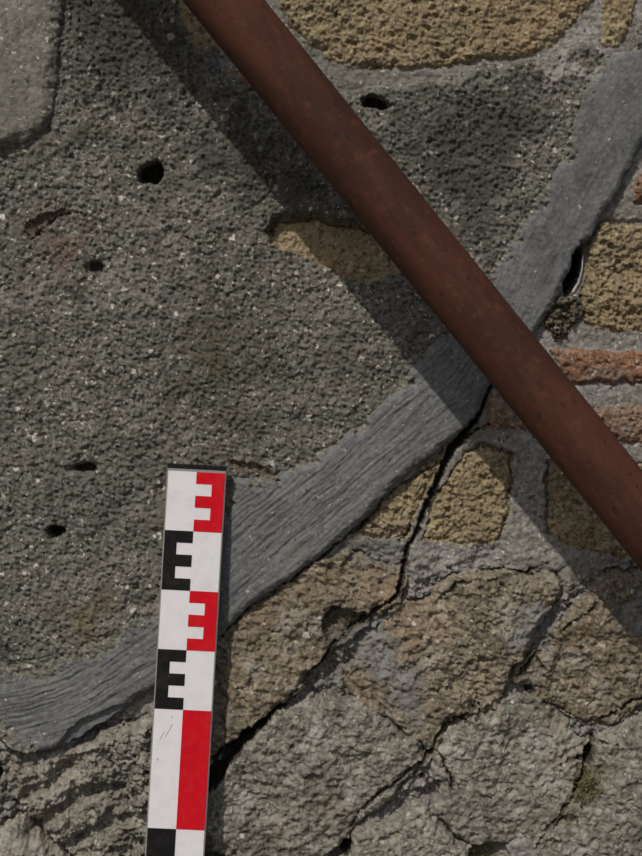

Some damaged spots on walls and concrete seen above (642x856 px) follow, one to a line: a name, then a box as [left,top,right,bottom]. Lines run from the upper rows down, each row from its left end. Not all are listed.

spalling [268,215,400,285]
spalling [543,293,587,342]
crack [208,383,492,793]
crack [435,562,550,605]
crack [516,603,598,680]
crack [350,696,482,829]
crack [540,696,642,840]